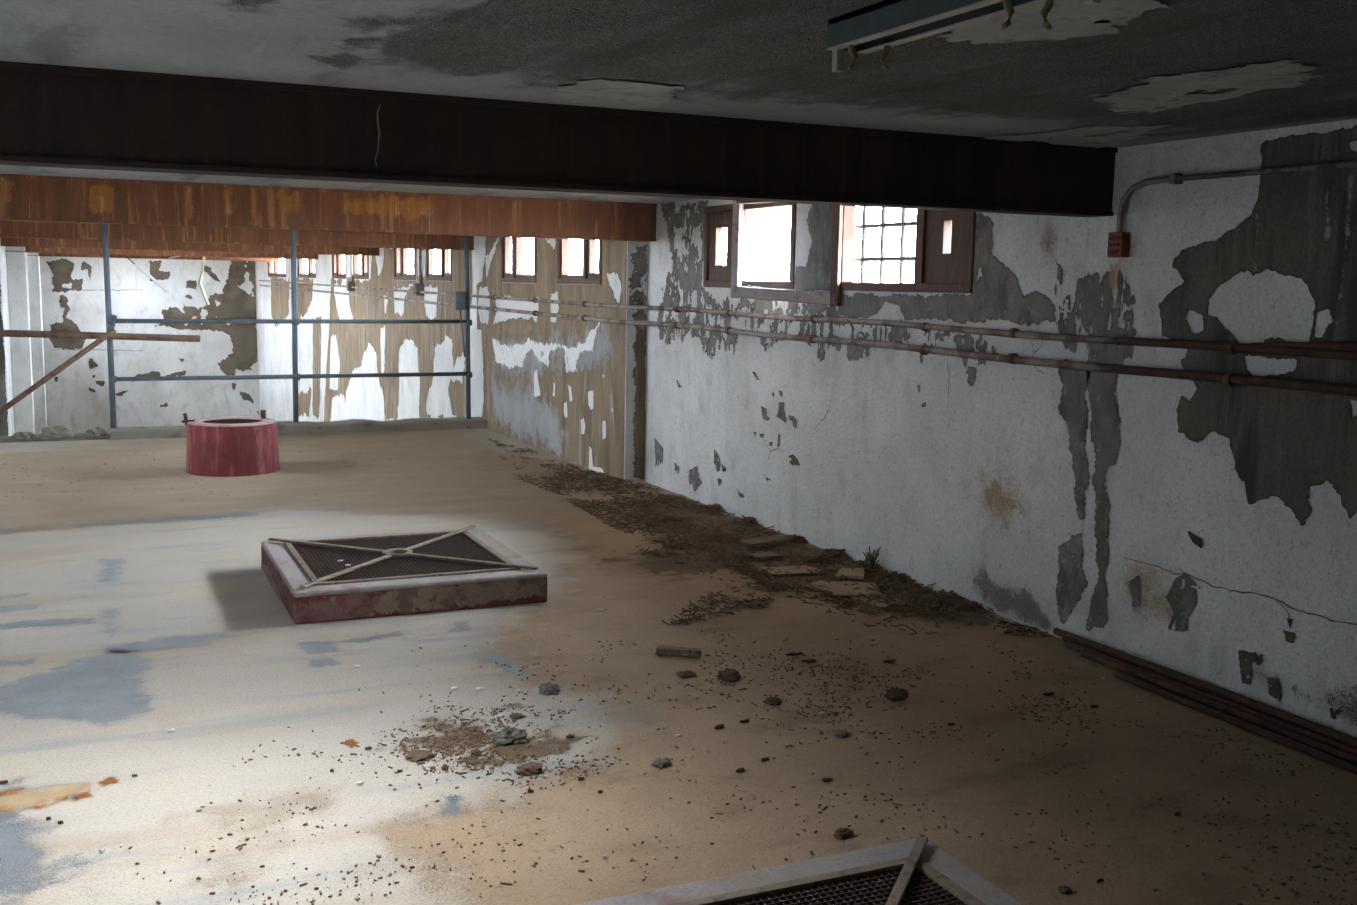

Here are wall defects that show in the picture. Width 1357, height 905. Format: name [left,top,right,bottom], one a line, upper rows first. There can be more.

peeling [0,285,9,436]
peeling [46,258,186,396]
peeling [155,200,1137,631]
peeling [1159,125,1357,526]
water stain [73,512,259,528]
water stain [0,593,227,727]
peeling [1128,576,1141,607]
peeling [1166,575,1201,632]
crack [1124,558,1357,629]